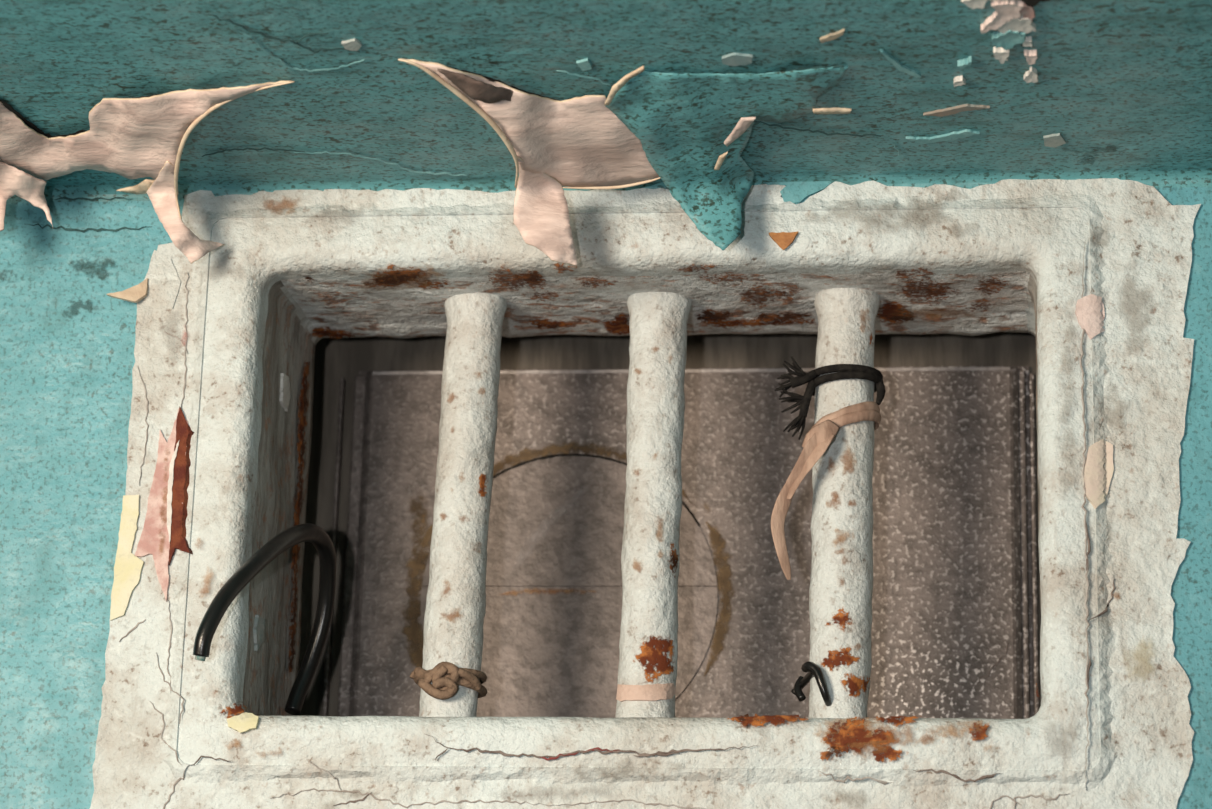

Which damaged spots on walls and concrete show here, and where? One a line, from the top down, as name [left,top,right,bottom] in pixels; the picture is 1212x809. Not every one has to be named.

spalling [961,0,1050,83]
spalling [953,56,972,87]
peeling [0,58,852,266]
rust [363,265,448,289]
rust [674,264,815,329]
peeling [90,178,1201,809]
rust [633,636,674,683]
rust [822,647,870,697]
crack [119,600,229,809]
crack [426,734,757,761]
rust [818,716,930,762]
crack [273,761,706,809]